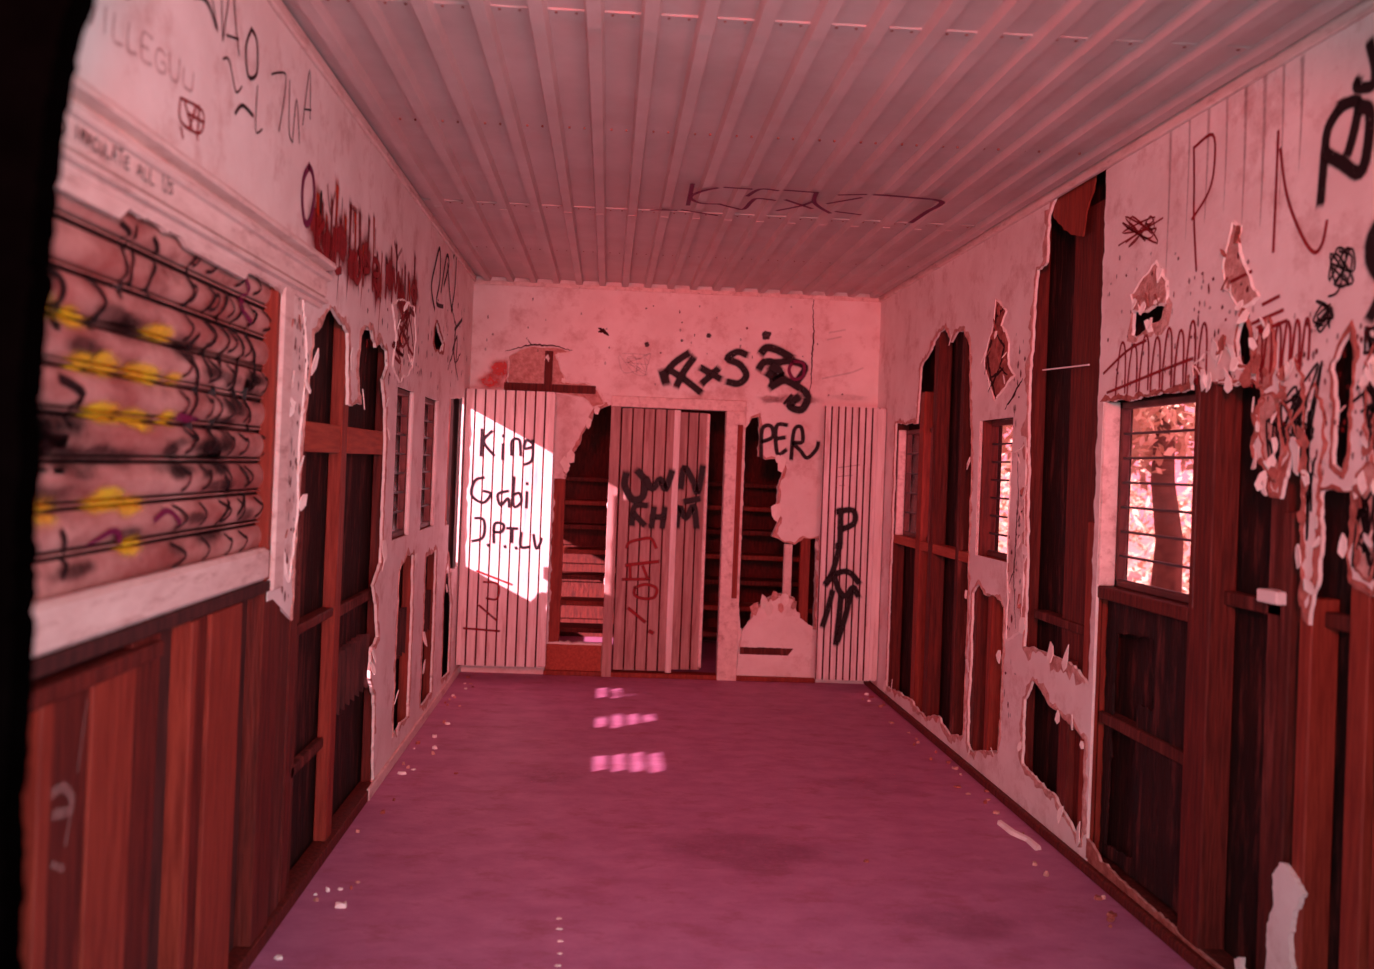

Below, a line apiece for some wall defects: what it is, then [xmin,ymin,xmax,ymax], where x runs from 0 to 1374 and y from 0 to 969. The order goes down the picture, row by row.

flaking render [284,296,454,738]
flaking render [504,346,608,479]
spalling [749,413,819,630]
flaking render [883,201,1088,848]
spalling [1100,220,1374,625]